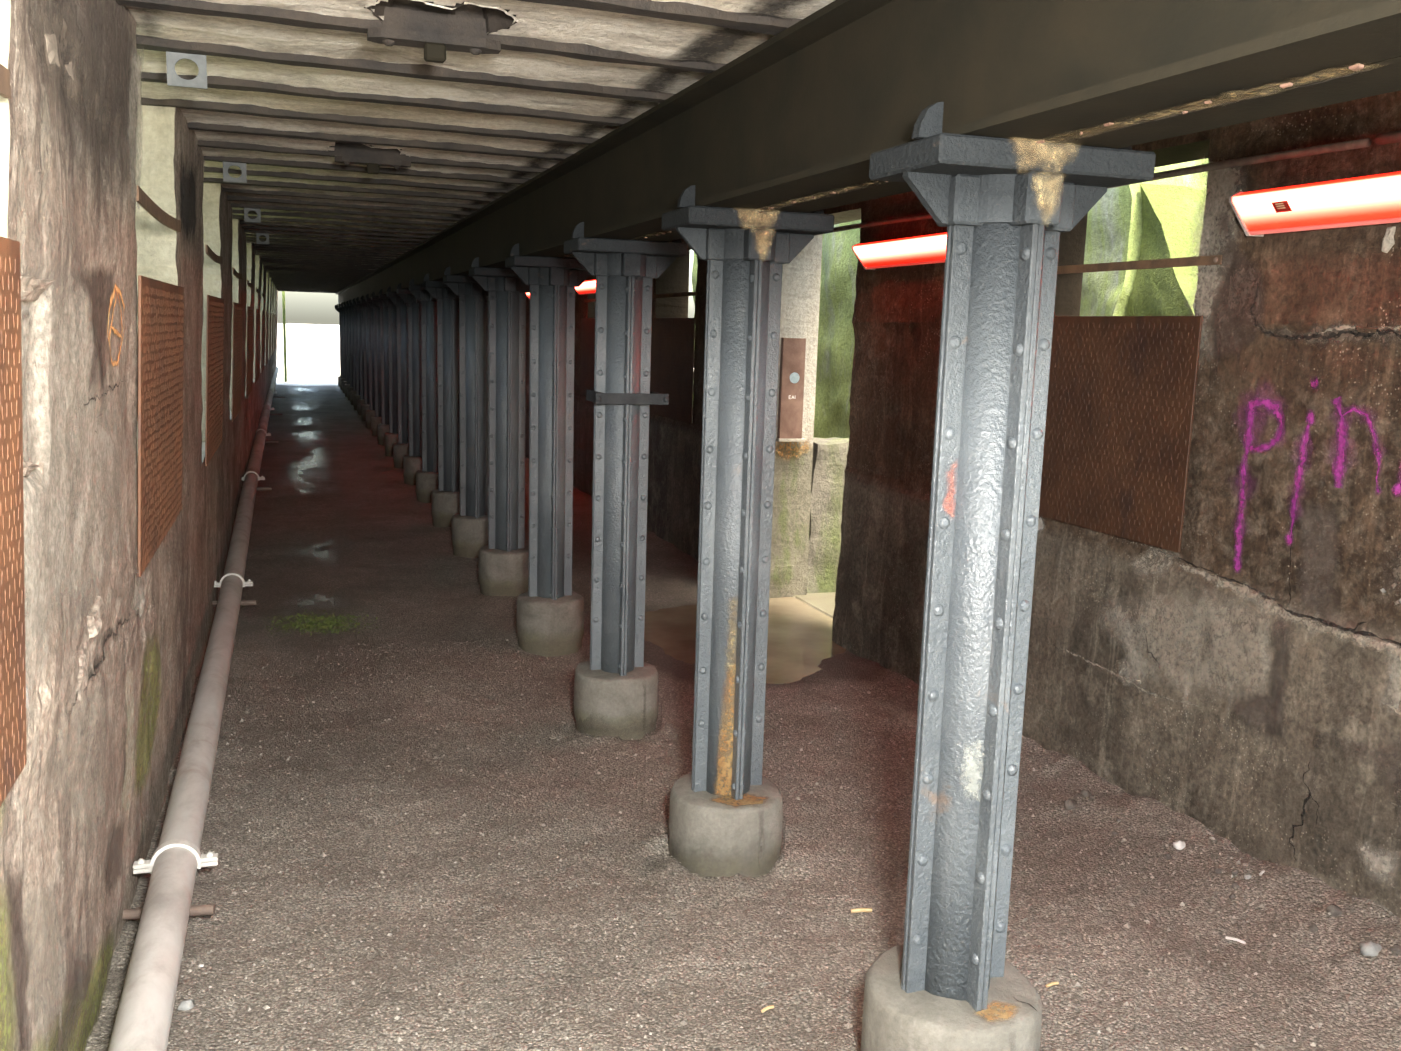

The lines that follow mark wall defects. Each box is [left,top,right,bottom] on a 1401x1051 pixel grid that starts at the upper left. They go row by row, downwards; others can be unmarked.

crack [69,596,131,723]
rust [712,613,766,807]
crack [1289,762,1319,861]
rust [976,1002,1016,1020]